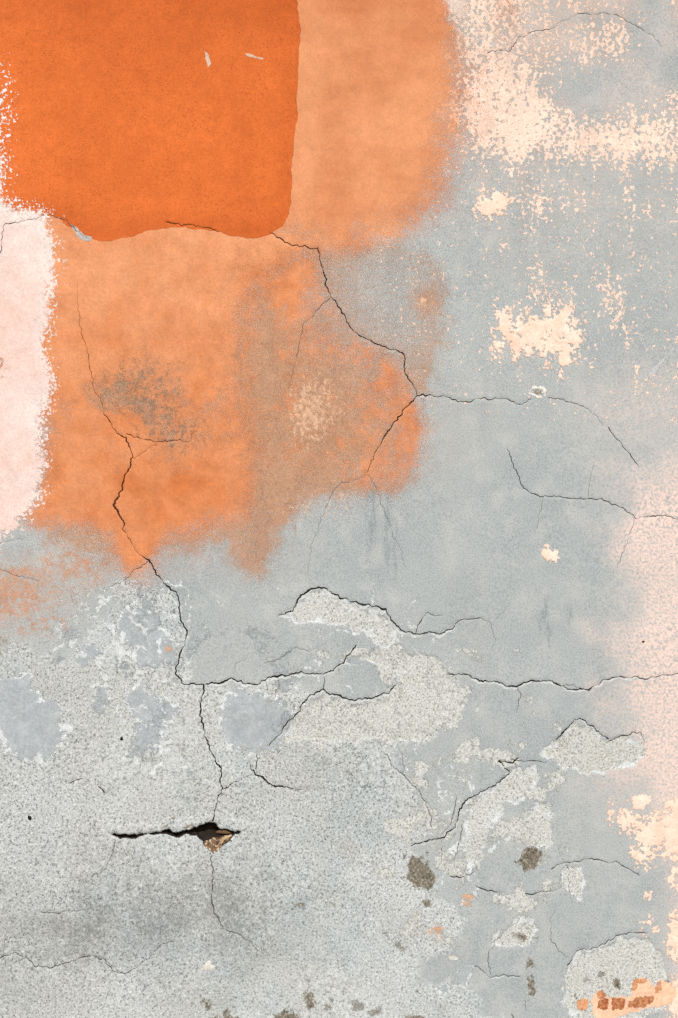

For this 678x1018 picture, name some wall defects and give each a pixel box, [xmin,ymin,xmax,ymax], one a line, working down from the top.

crack [0,214,90,254]
crack [165,221,220,232]
peeling [377,0,678,421]
crack [272,233,639,652]
crack [77,282,397,821]
crack [507,449,675,569]
crack [449,673,678,714]
crack [379,718,645,892]
crack [0,853,259,974]
crack [475,922,520,979]
crack [525,858,645,965]
spalling [560,794,678,1018]